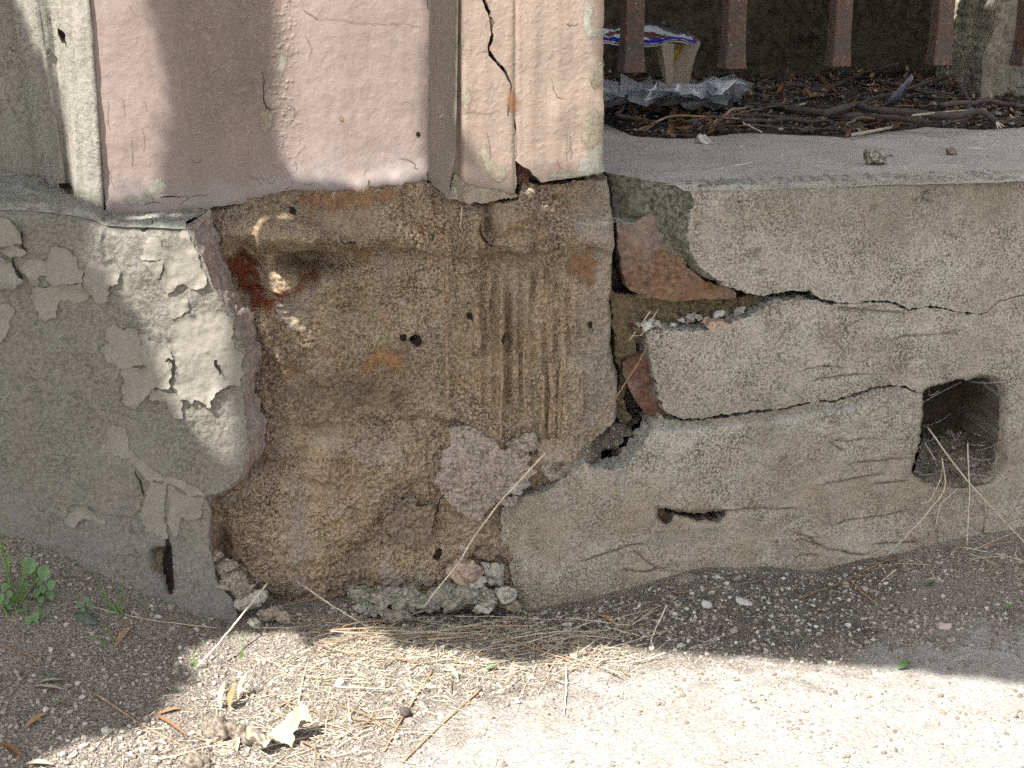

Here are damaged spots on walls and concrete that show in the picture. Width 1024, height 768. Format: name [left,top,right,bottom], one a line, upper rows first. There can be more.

crack [474,0,517,158]
peeling [0,218,121,322]
crack [617,282,628,290]
crack [732,288,807,296]
peeling [0,303,15,343]
spalling [700,316,732,333]
spalling [99,109,617,601]
peeling [64,506,106,528]